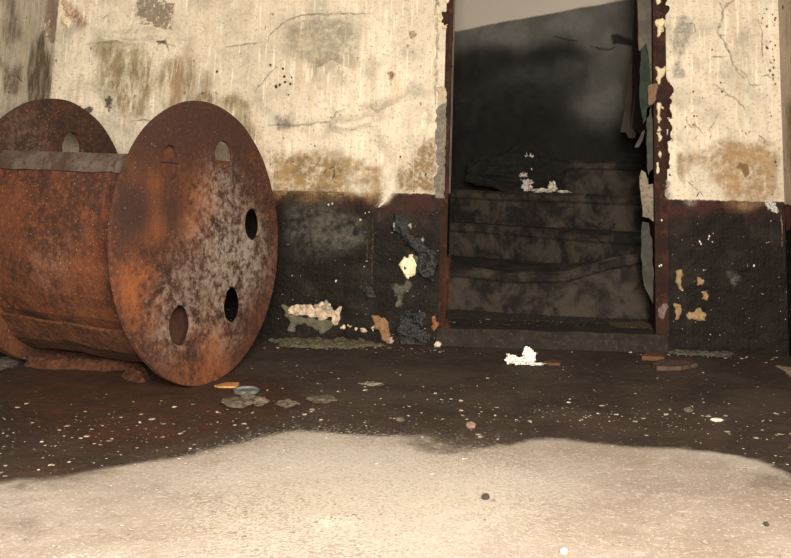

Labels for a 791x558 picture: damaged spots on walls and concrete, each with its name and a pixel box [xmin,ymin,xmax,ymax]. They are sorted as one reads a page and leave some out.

leakage [134,0,175,30]
peeling [655,0,670,37]
leakage [102,45,192,113]
leakage [224,96,251,134]
peeling [648,17,692,199]
leakage [679,143,791,243]
spalling [399,254,418,279]
spalling [658,269,709,321]
spalling [281,300,394,343]
leakage [0,336,791,481]